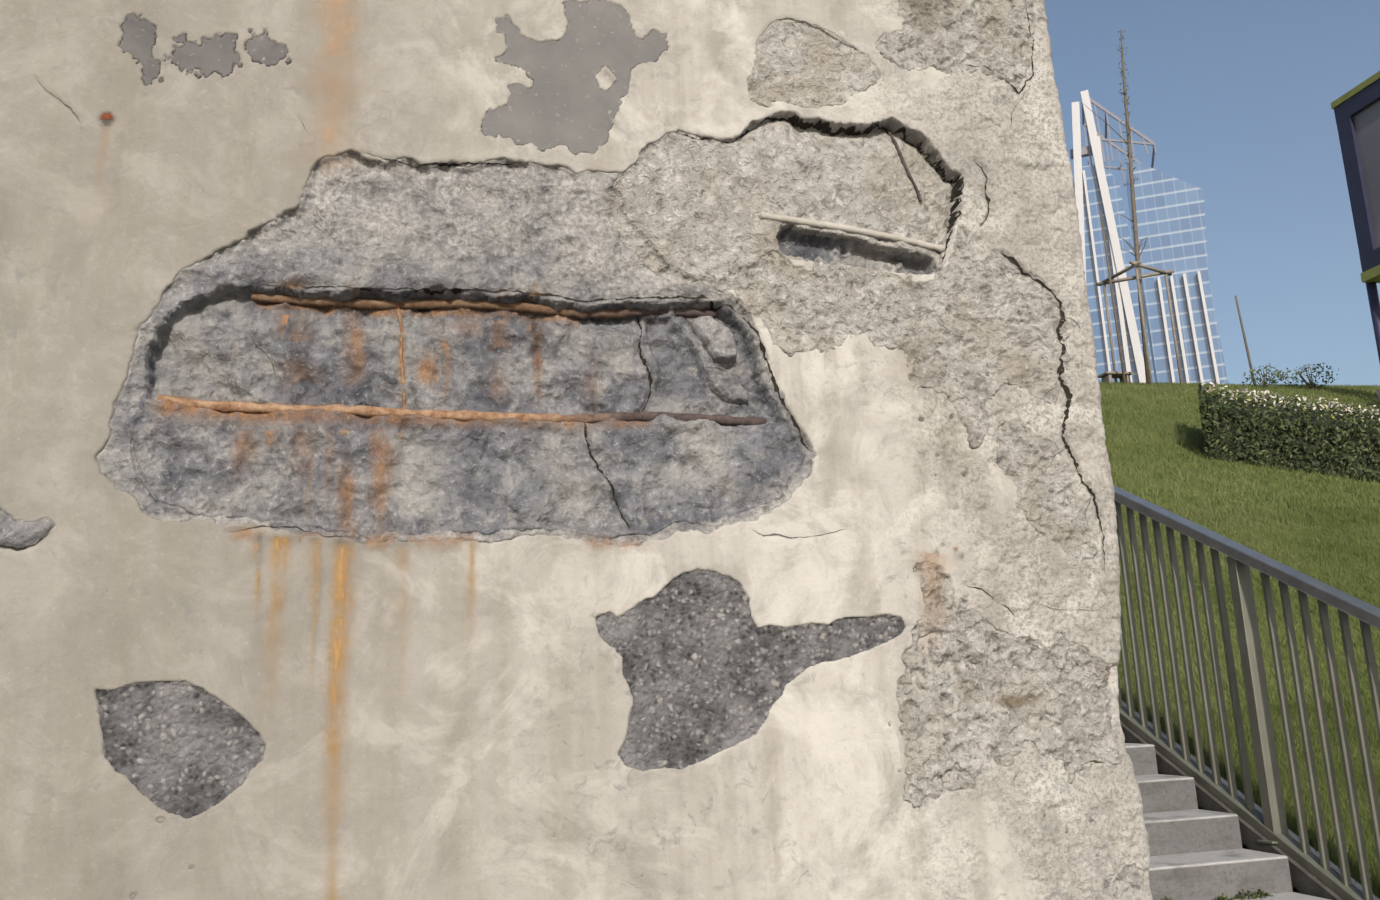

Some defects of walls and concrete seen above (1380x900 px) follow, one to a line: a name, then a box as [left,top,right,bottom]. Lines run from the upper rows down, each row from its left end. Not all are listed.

spalling [96,0,1098,566]
crack [942,161,990,262]
peeling [0,507,55,550]
rust [331,546,347,706]
flaking render [888,562,1123,808]
crack [965,253,1107,623]